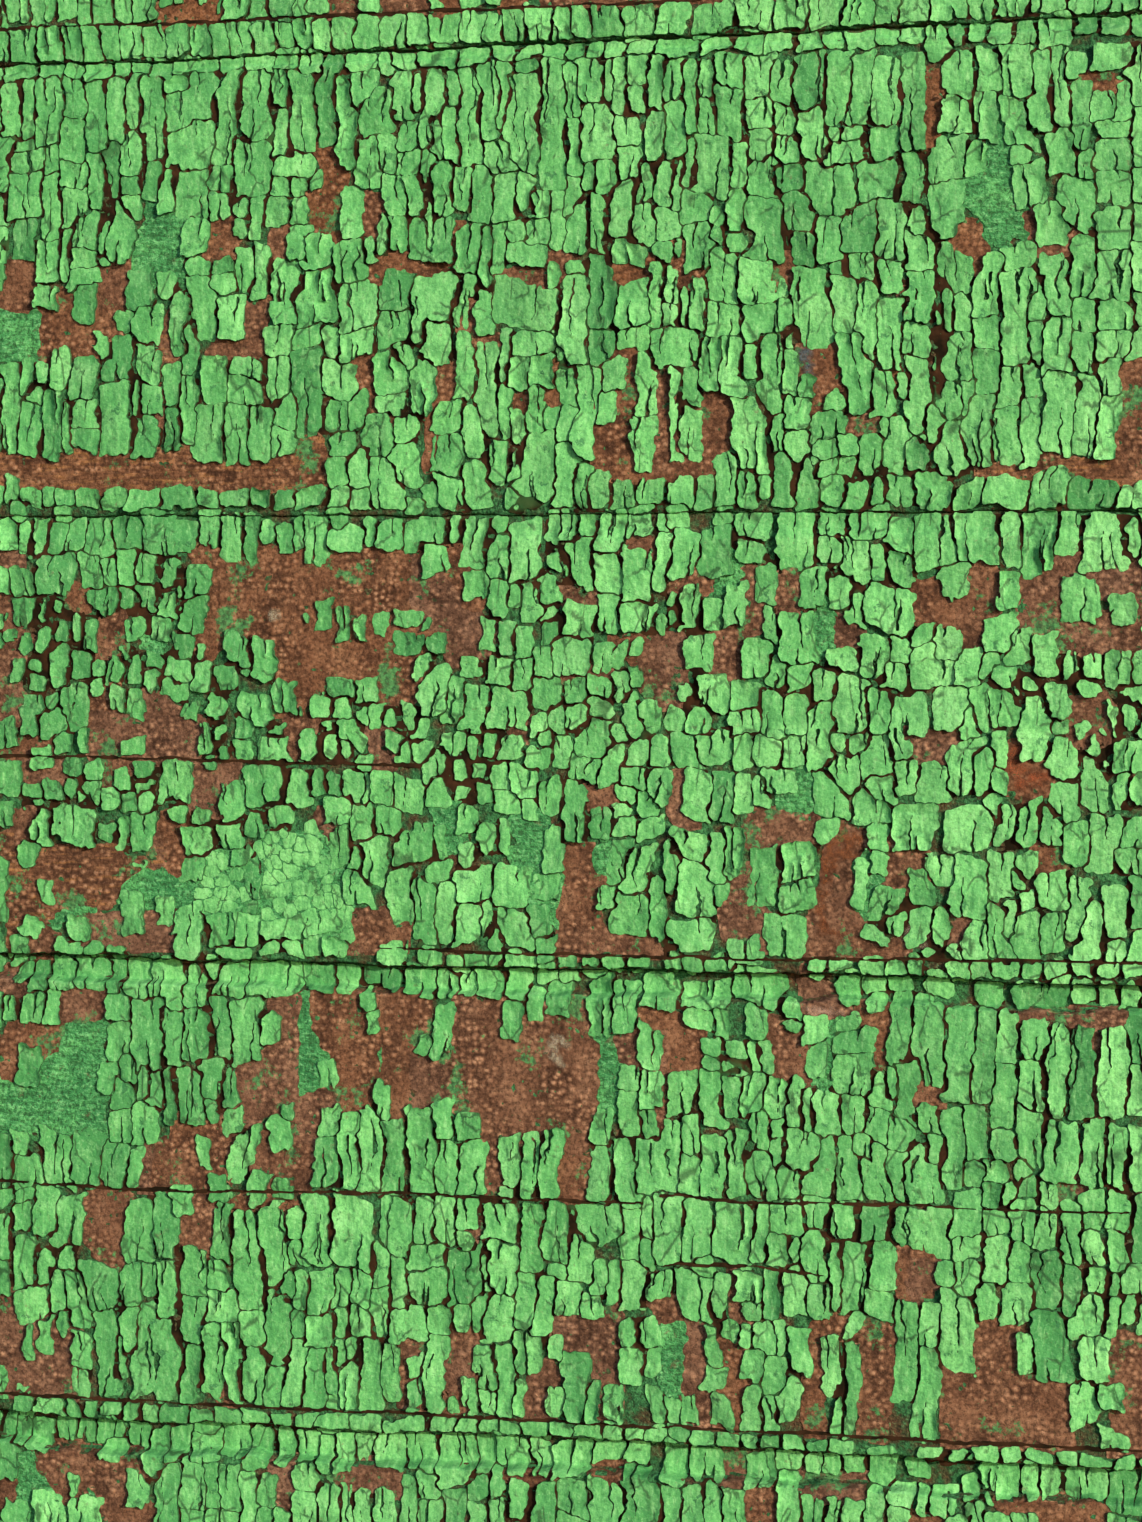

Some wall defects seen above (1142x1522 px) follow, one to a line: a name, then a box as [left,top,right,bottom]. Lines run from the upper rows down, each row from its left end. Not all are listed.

crack [0,0,1142,625]
peeling [0,0,1142,978]
crack [438,284,1142,930]
peeling [0,509,761,1425]
peeling [0,951,1142,1522]